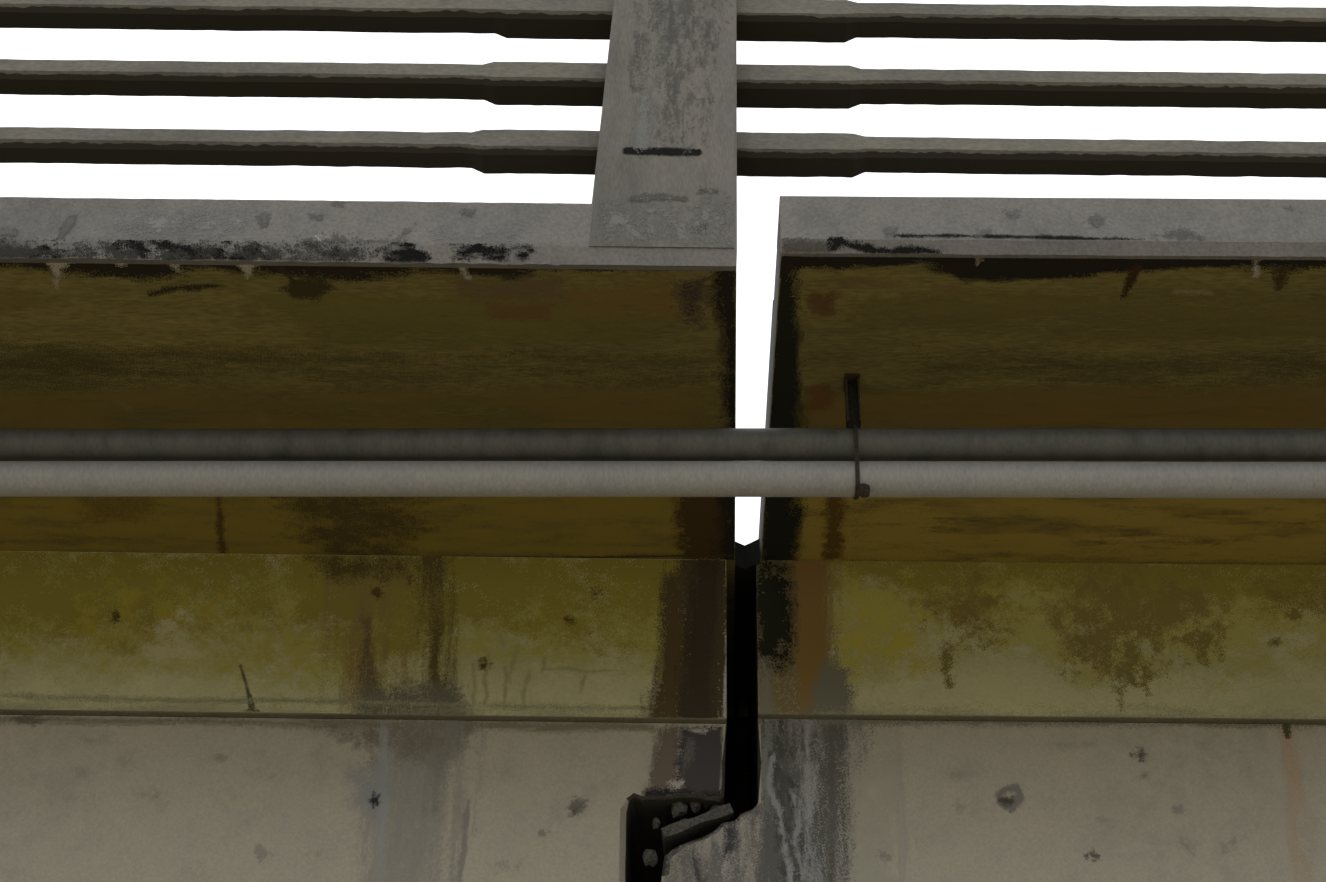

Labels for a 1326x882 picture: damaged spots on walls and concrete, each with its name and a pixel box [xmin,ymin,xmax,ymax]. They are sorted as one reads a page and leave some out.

damp [0,497,735,882]
damp [665,497,1326,882]